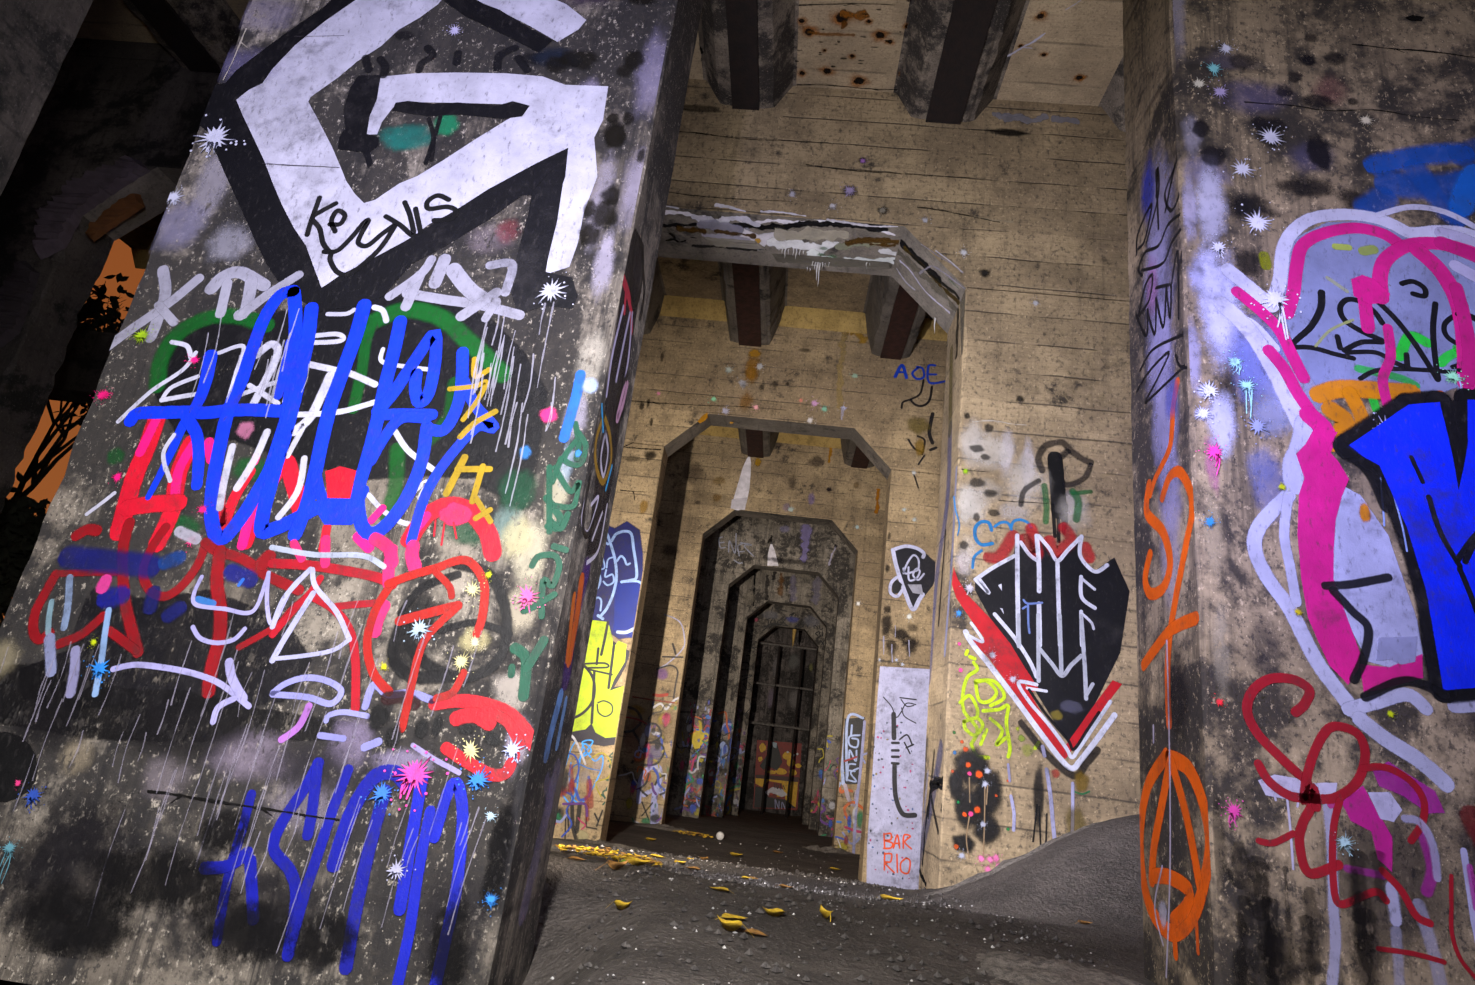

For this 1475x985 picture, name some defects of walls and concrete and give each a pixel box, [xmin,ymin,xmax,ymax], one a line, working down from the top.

corrosion [798,10,894,76]